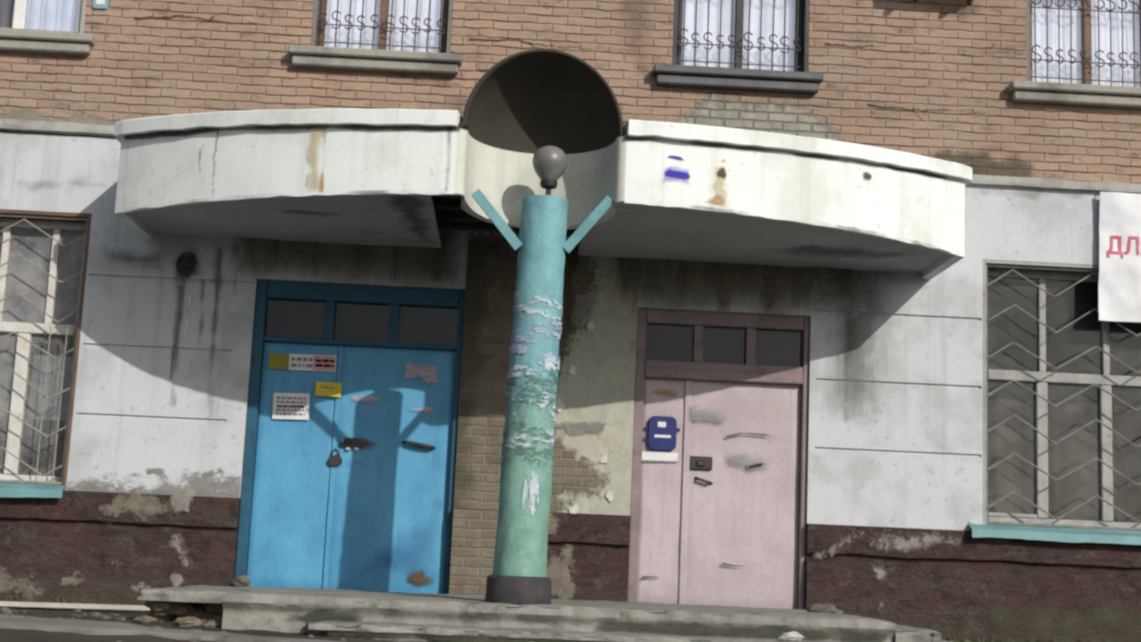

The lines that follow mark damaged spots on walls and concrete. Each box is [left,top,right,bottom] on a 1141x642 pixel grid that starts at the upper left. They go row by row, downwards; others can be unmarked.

rust [310,131,326,191]
rust [711,168,726,204]
leakage [201,248,222,332]
spalling [558,236,598,376]
spalling [449,231,519,595]
peeling [67,468,241,521]
spalling [522,433,613,600]
spalling [813,529,955,559]
spalling [0,568,45,601]
spalling [61,573,84,586]